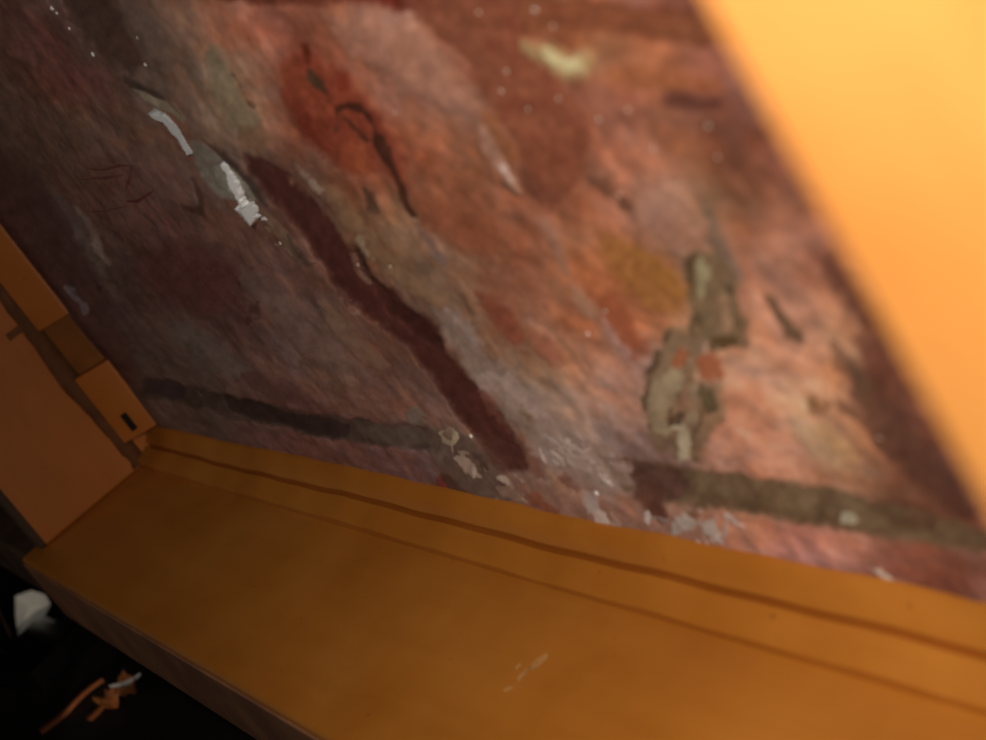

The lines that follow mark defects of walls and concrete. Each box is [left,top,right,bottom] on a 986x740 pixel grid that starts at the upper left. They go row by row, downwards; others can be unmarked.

peeling [122,73,318,267]
peeling [639,199,753,464]
spalling [426,422,531,506]